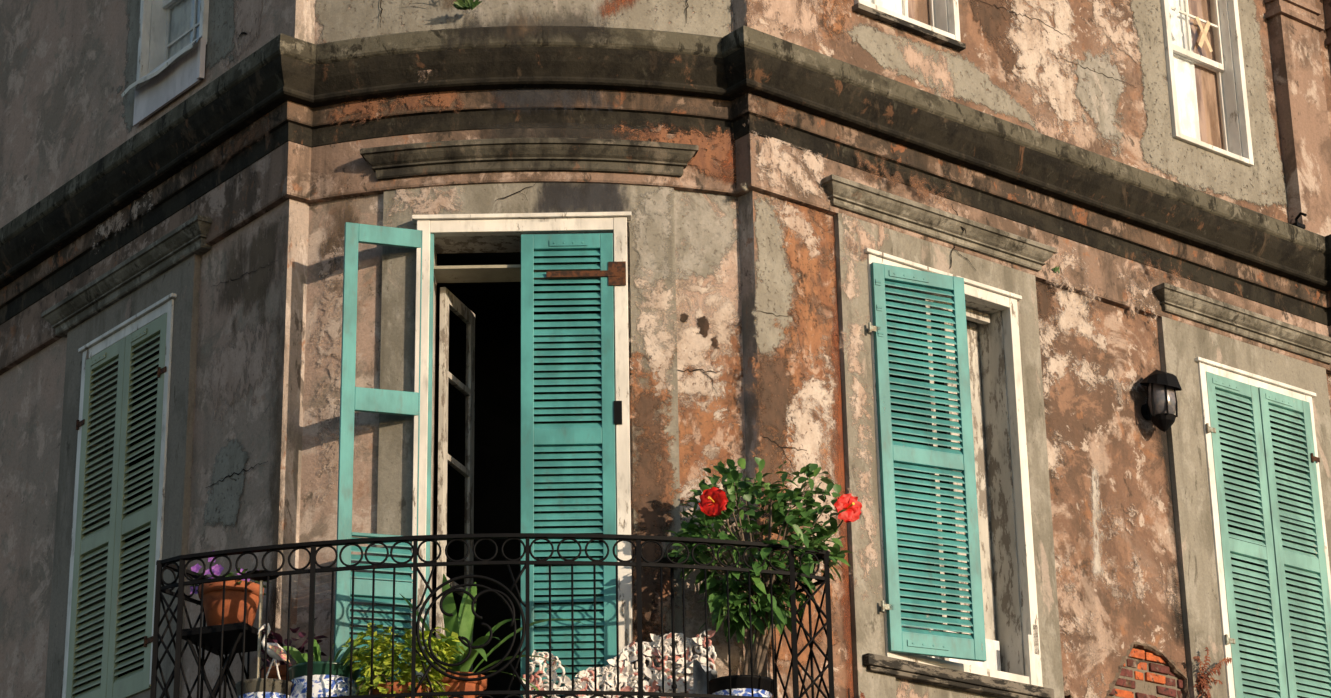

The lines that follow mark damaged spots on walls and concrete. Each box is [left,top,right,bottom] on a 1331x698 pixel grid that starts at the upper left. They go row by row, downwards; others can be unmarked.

corrosion [329,91,463,127]
peeling [1006,0,1087,138]
peeling [1089,0,1145,63]
peeling [1038,248,1147,413]
peeling [628,131,889,675]
peeling [1046,430,1075,479]
peeling [1093,507,1176,604]
peeling [896,679,929,698]
spalling [1059,613,1190,698]